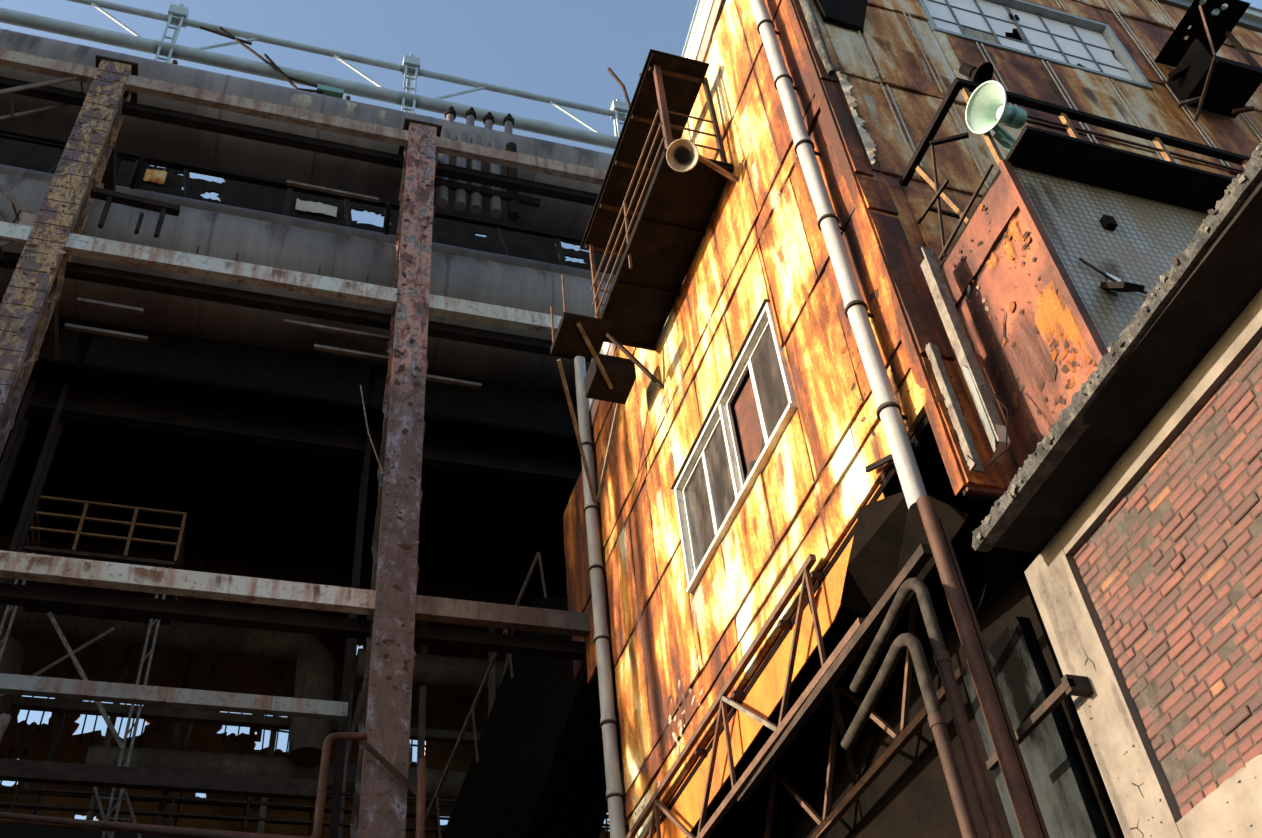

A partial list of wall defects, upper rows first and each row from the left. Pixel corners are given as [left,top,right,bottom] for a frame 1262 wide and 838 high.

rust [1082,87,1124,117]
rust [782,151,808,203]
rust [827,141,841,179]
rust [802,281,865,401]
rust [933,376,965,416]
rust [596,417,630,506]
rust [767,449,784,487]
rust [815,467,842,514]
rust [861,417,880,461]
rust [731,506,756,540]
rust [628,606,651,666]
rust [622,693,647,775]